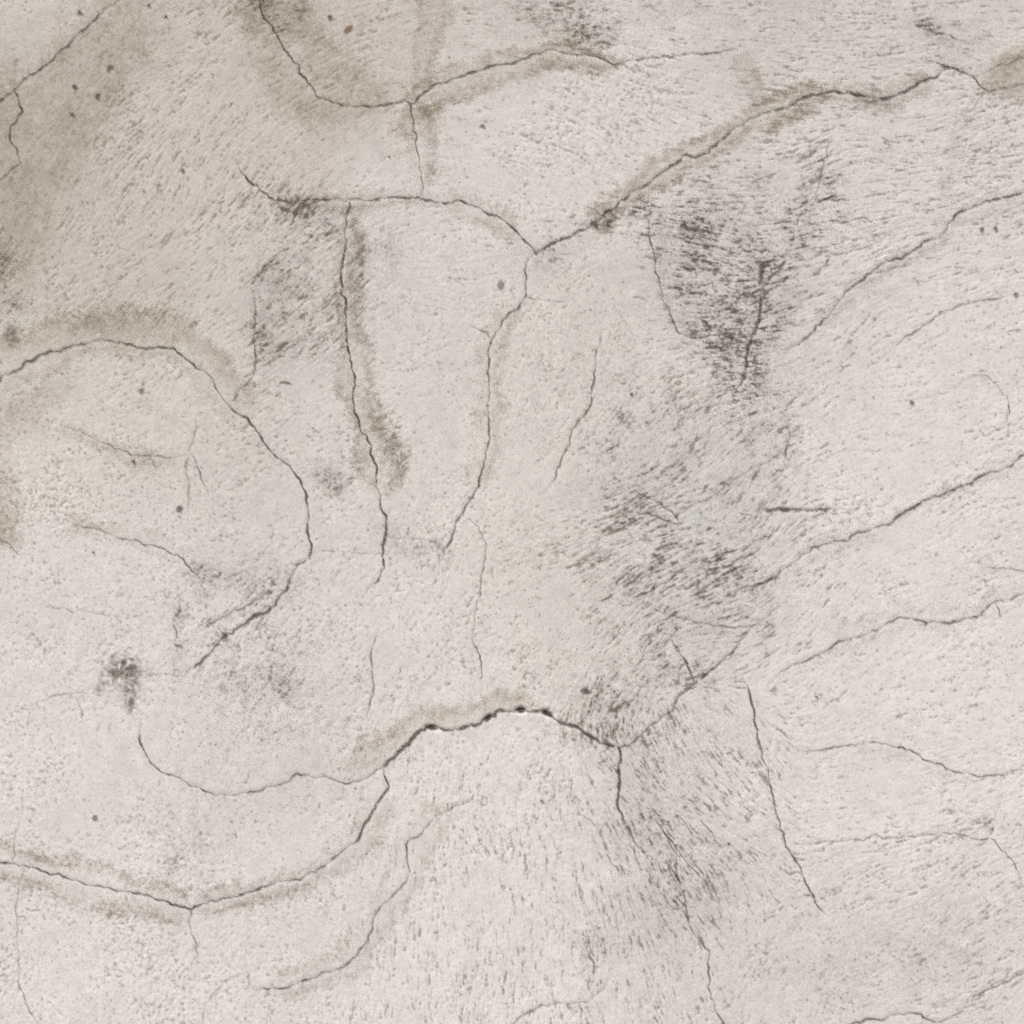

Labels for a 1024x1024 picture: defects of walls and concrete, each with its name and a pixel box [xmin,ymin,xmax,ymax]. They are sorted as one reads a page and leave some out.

crack [0,8,106,180]
crack [240,0,1024,591]
crack [0,311,312,668]
crack [787,594,1020,669]
crack [261,804,459,990]
crack [0,615,769,910]
crack [748,688,822,911]
crack [851,973,1023,1024]